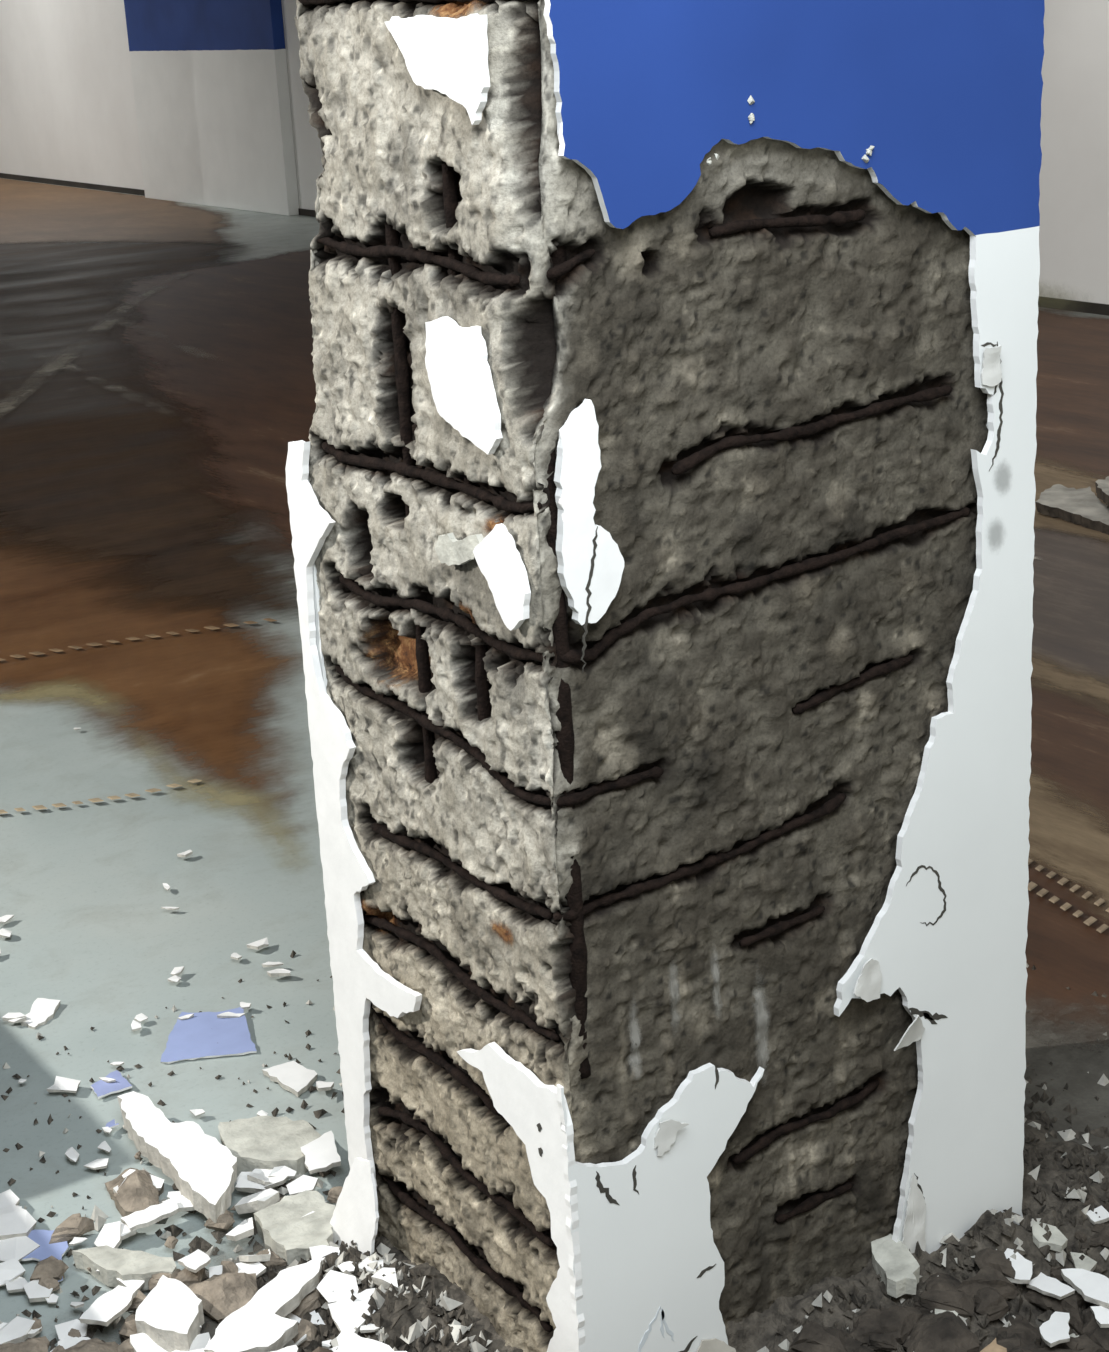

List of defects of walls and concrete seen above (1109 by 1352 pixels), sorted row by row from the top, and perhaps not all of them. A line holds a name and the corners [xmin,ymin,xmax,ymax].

corrosion [432,0,479,18]
crack [981,342,1004,471]
corrosion [366,624,418,677]
water stain [0,684,107,704]
spalling [294,0,1002,1352]
crack [906,865,946,926]
spalling [262,1061,317,1097]
spalling [120,1198,178,1232]
spalling [177,1249,211,1273]
spalling [1004,1248,1032,1284]
spalling [79,1285,138,1326]
spalling [204,1255,322,1352]